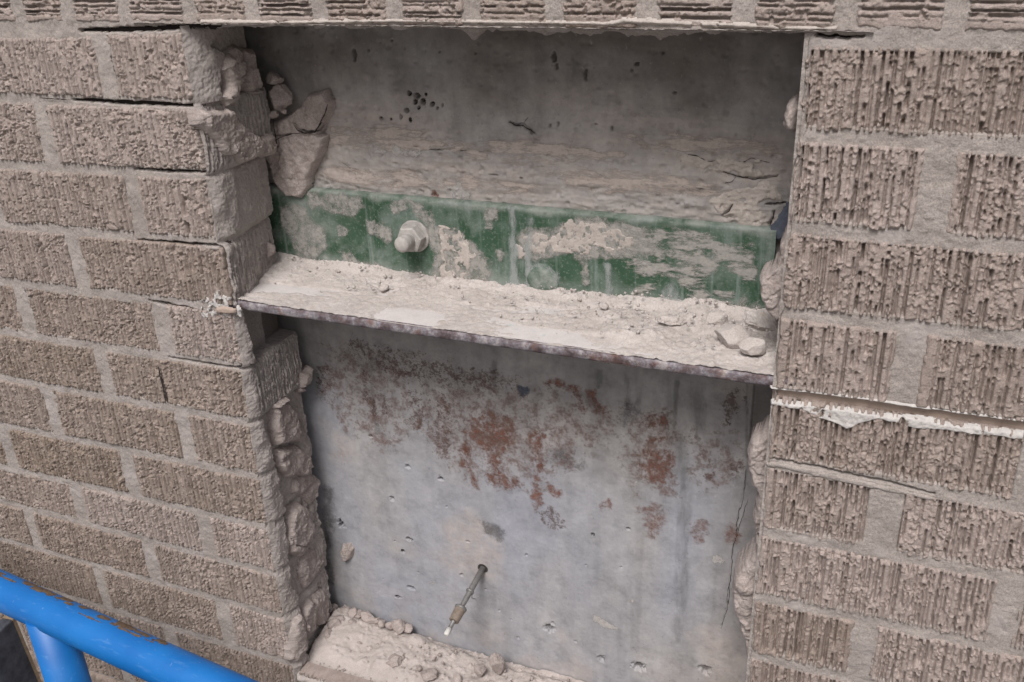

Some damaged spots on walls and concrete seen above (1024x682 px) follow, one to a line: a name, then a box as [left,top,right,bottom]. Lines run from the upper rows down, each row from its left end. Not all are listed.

crack [84,24,222,32]
crack [42,98,206,107]
peeling [280,192,392,259]
peeling [390,198,504,281]
peeling [515,216,759,309]
corrosion [316,339,605,529]
corrosion [631,414,675,494]
crack [721,471,748,628]